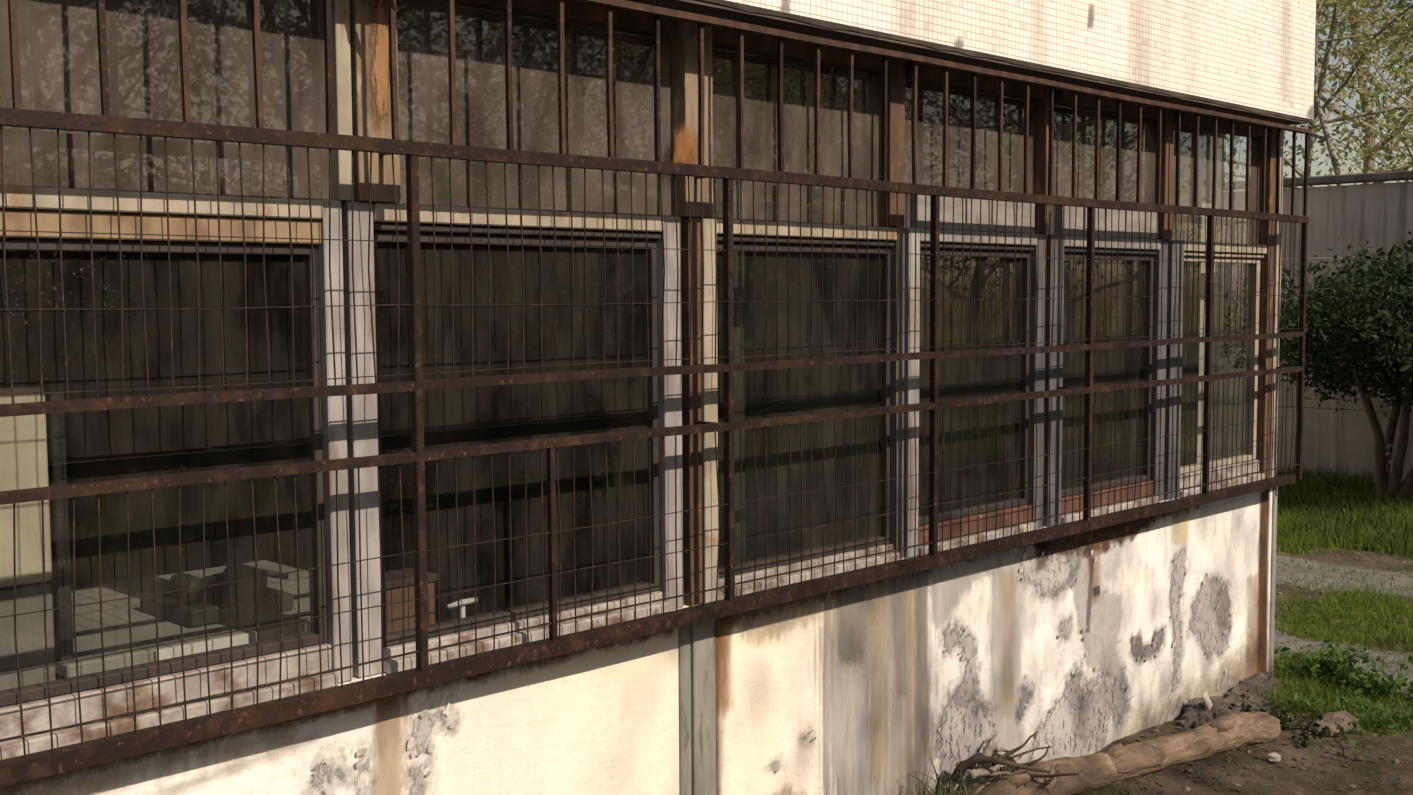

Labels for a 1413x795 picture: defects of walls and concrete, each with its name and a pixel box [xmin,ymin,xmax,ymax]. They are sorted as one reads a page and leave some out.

rust [1007,505,1199,569]
rust [3,731,240,791]
peeling [310,747,376,795]
rust [260,650,584,795]
peeling [407,703,458,795]
leakage [820,550,1024,795]
peeling [930,621,998,794]
peeling [1016,546,1234,762]